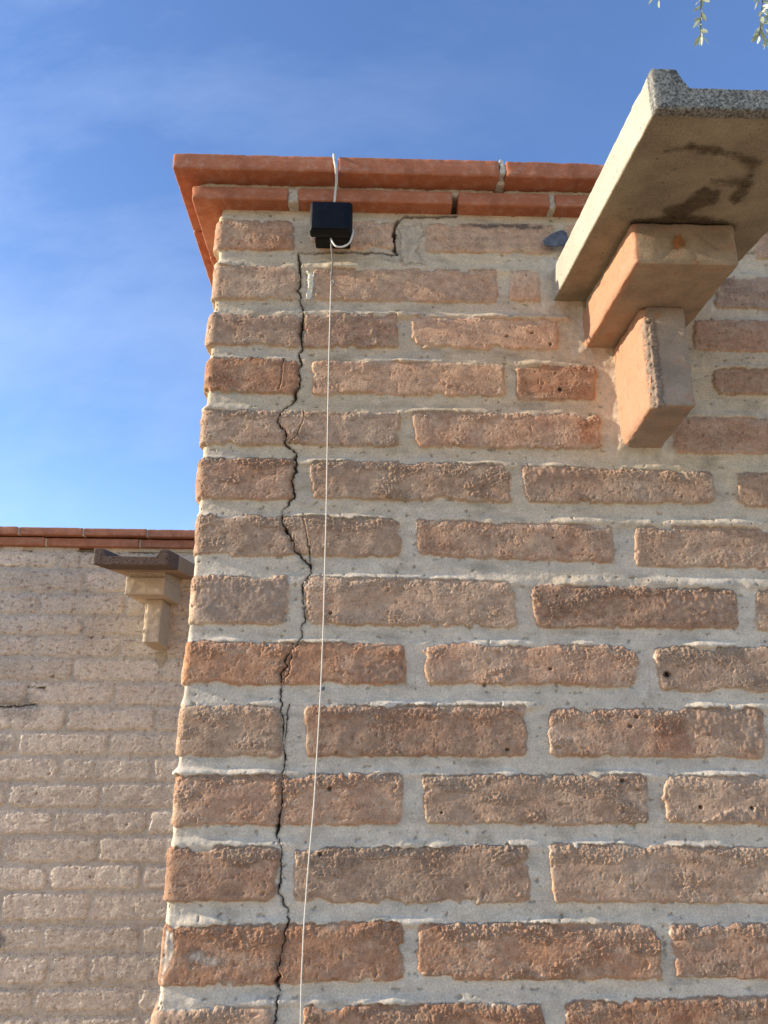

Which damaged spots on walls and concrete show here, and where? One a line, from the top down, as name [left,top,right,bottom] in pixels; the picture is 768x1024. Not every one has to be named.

leakage [631,157,757,226]
crack [272,214,458,1024]